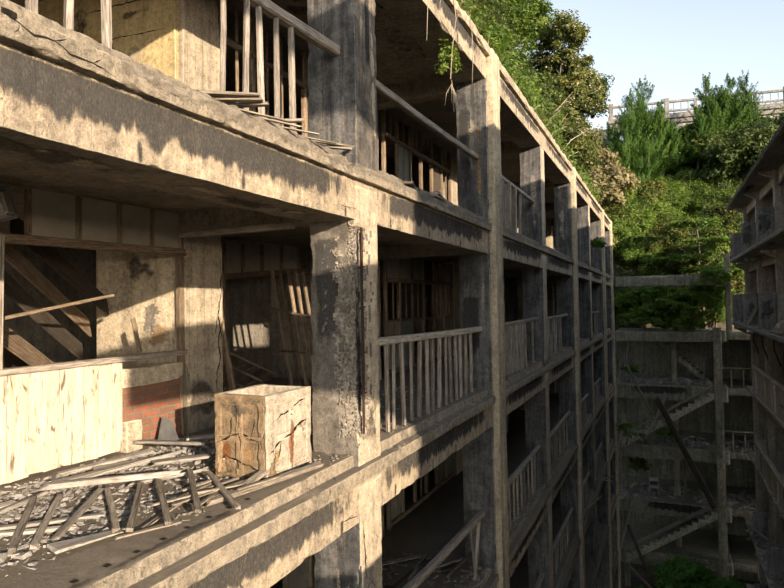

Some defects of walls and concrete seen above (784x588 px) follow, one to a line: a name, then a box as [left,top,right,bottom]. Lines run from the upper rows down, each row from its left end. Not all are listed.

crack [88,0,140,14]
crack [7,15,164,73]
water stain [129,259,153,279]
crack [214,260,222,387]
spalling [332,221,371,449]